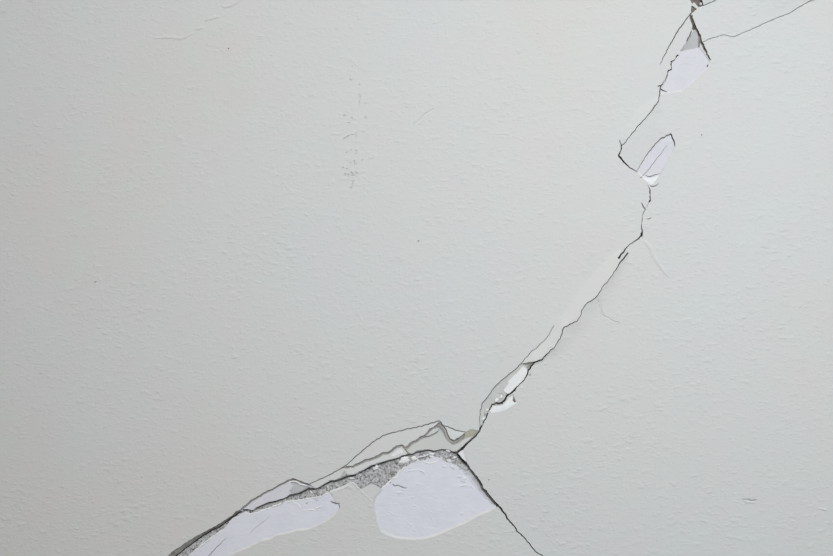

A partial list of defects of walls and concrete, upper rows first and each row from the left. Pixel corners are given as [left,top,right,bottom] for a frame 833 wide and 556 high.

peeling [660,47,710,94]
peeling [637,134,675,184]
crack [169,0,813,556]
peeling [188,457,497,556]